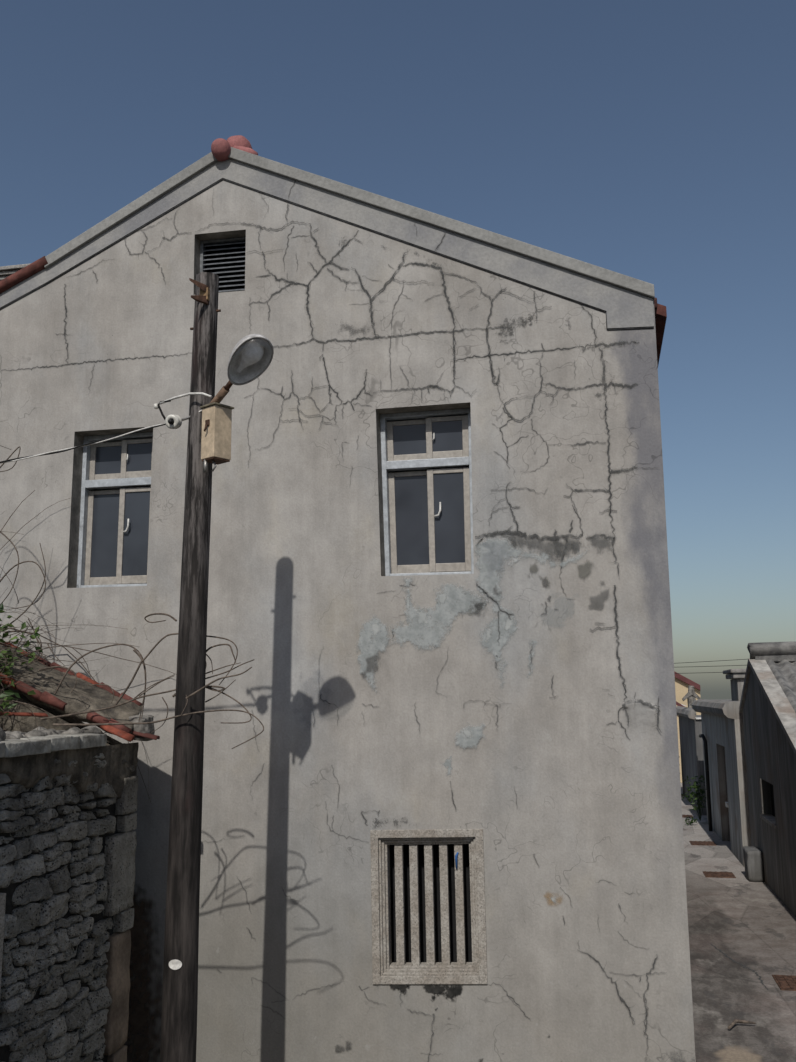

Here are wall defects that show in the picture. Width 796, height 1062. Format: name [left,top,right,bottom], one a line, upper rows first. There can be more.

crack [1,265,184,371]
crack [125,180,638,699]
peeling [358,616,389,688]
peeling [475,539,583,685]
crack [580,951,658,1049]